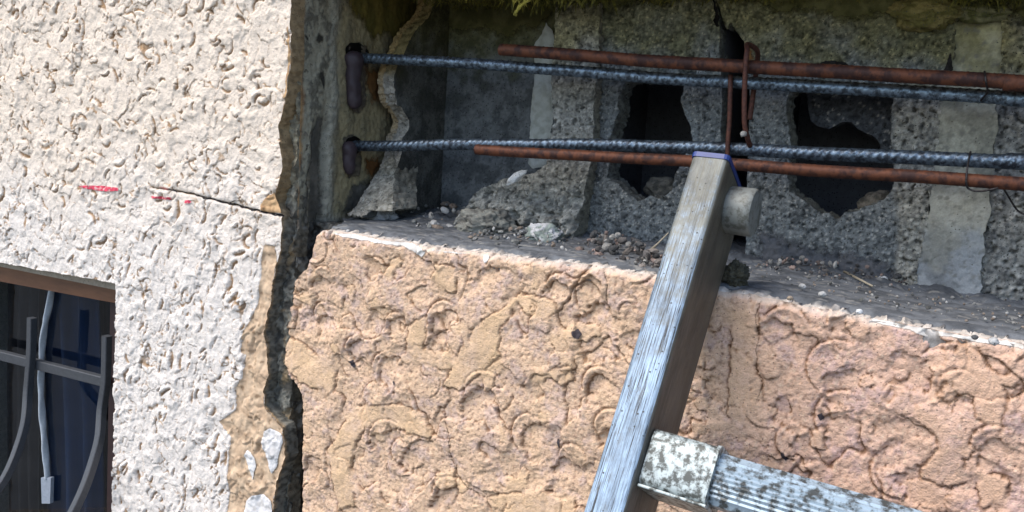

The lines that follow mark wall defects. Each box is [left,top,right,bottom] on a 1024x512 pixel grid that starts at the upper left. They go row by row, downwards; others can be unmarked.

crack [159,188,284,217]
flaking render [335,233,467,257]
spalling [352,43,1024,217]
peeling [219,244,285,512]